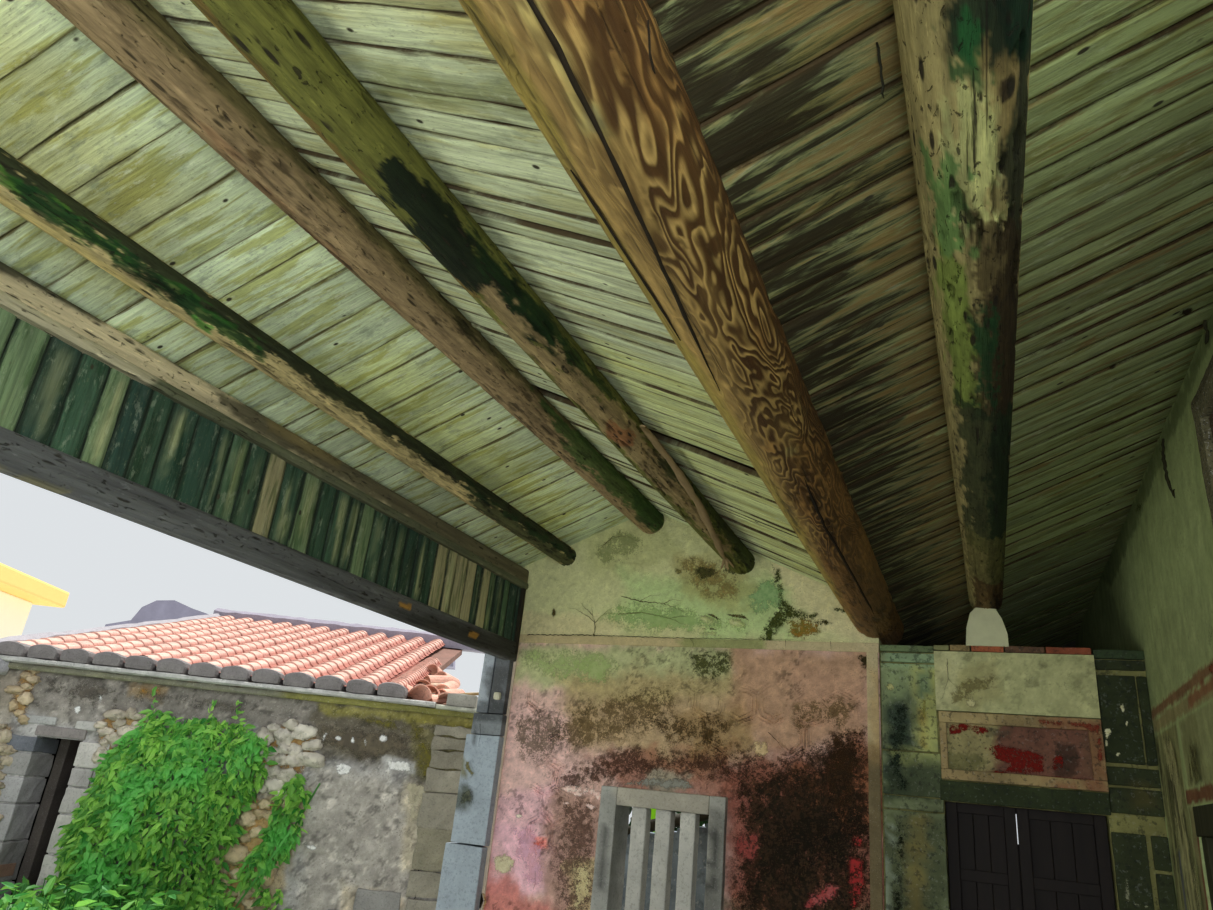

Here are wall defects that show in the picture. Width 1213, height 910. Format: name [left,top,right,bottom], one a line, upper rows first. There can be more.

leakage [675,558,738,599]
peeling [949,723,1091,780]
peeling [1038,720,1120,762]
leakage [517,713,870,910]